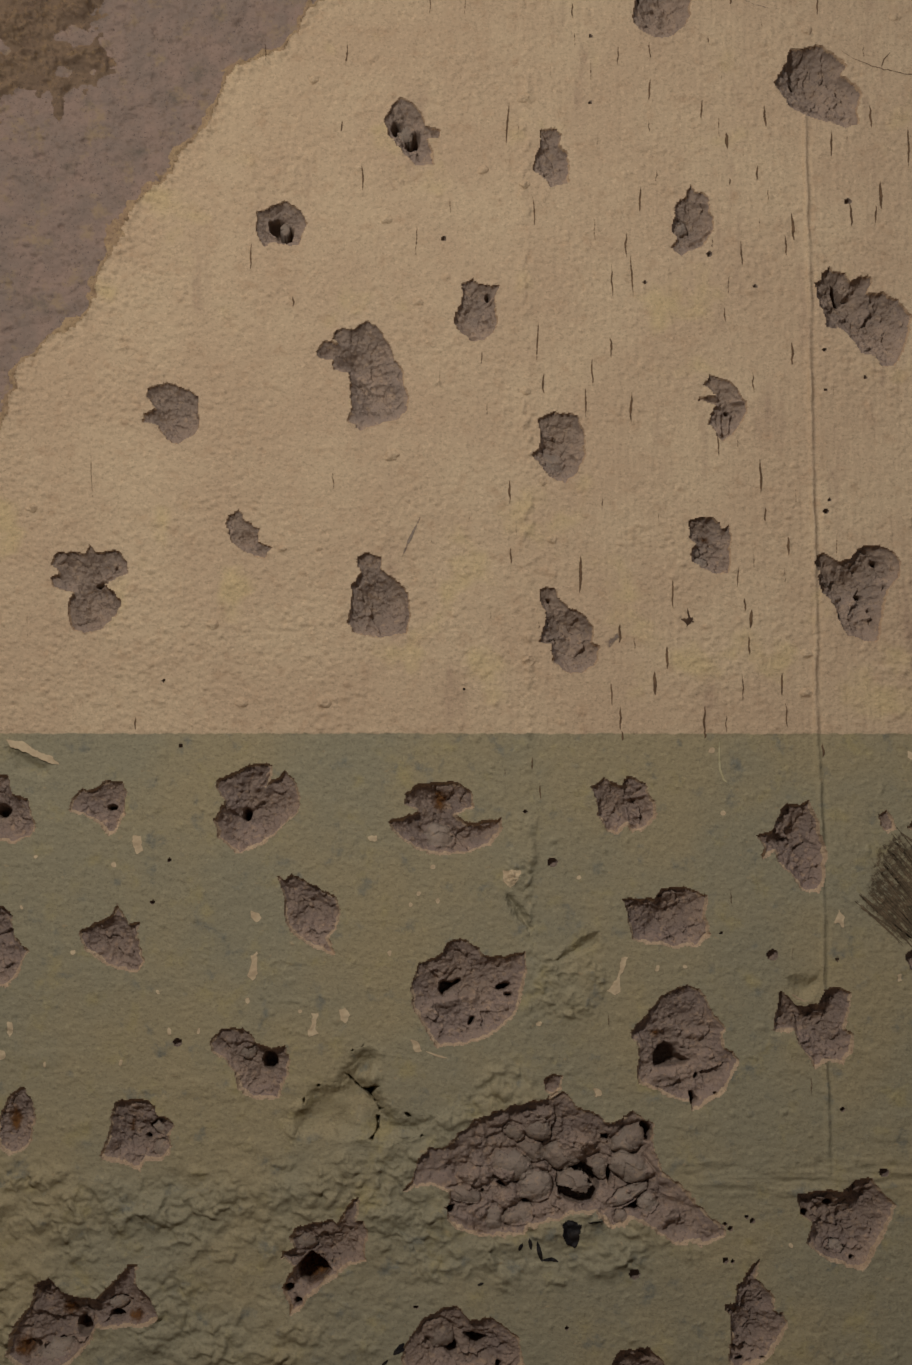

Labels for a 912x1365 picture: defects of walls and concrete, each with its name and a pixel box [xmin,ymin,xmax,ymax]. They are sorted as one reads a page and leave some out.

spalling [774,44,863,129]
spalling [0,0,324,430]
spalling [814,266,912,367]
spalling [142,382,200,444]
spalling [315,320,409,431]
spalling [50,544,129,634]
spalling [814,544,901,643]
spalling [213,762,301,853]
spalling [368,781,503,856]
spalling [410,938,527,1052]
spalling [630,984,739,1111]
spalling [4,1264,158,1365]